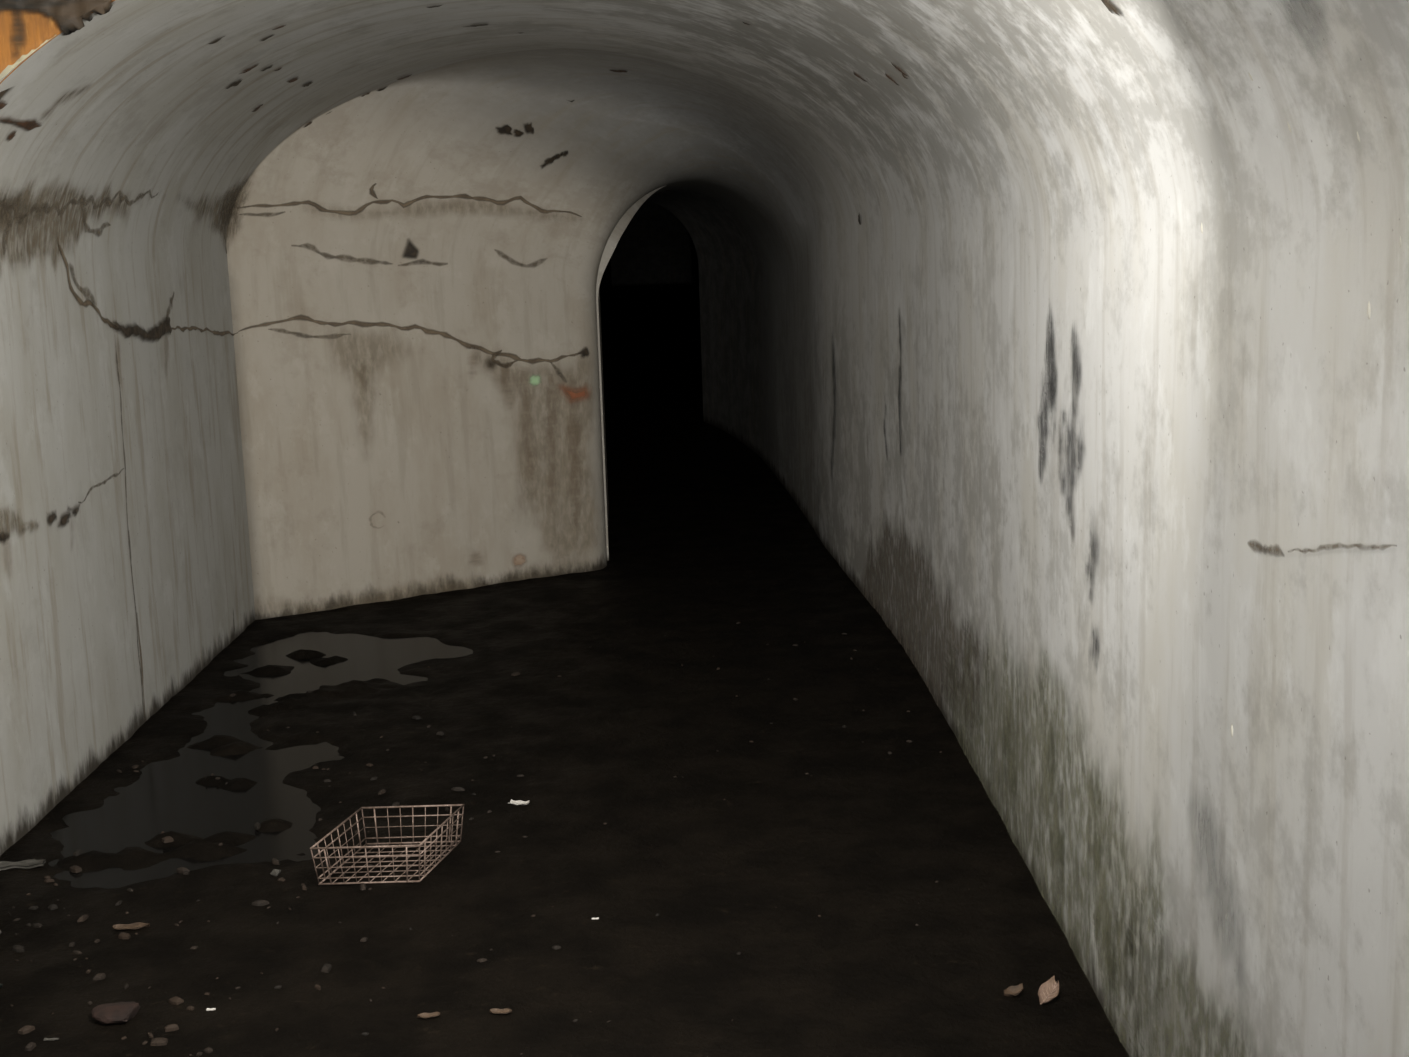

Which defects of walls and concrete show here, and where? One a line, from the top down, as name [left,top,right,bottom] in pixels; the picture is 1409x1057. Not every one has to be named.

corrosion [0,0,115,84]
crack [237,183,582,266]
crack [172,315,589,383]
crack [57,233,145,713]
crack [1248,542,1395,554]